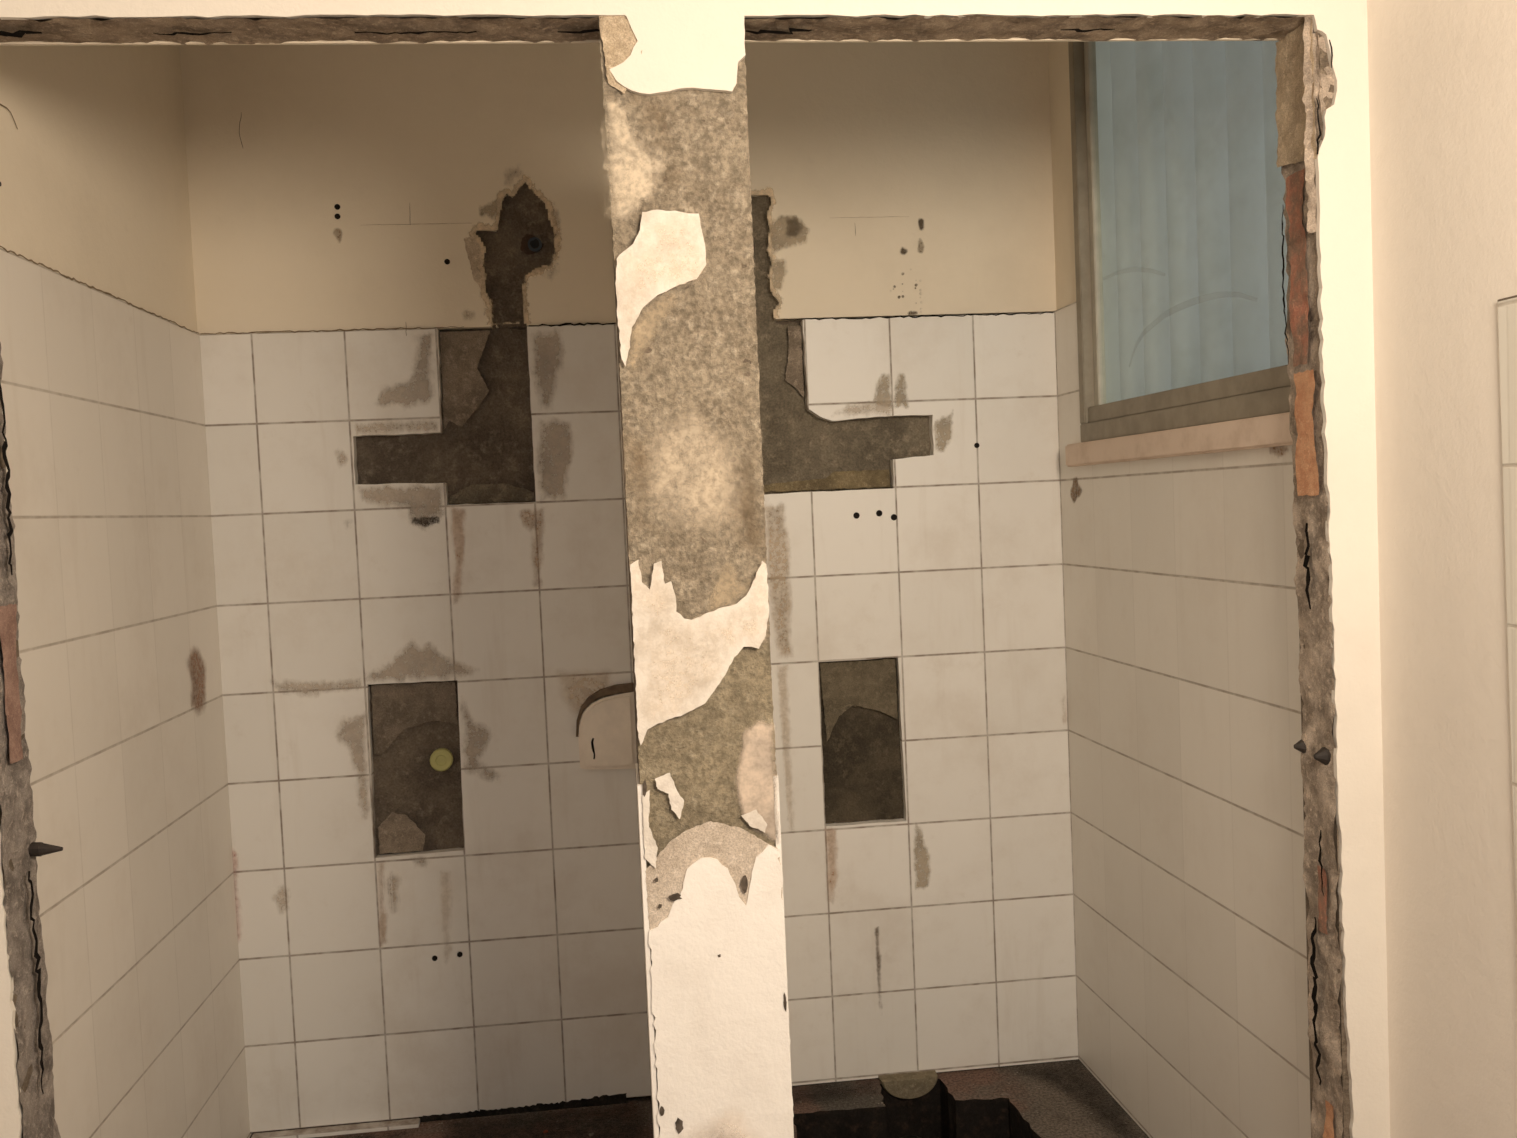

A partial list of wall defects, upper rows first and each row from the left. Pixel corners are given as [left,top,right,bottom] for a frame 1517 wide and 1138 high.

flaking render [1285,16,1334,496]
spalling [598,16,781,930]
flaking render [0,604,23,764]
peeling [370,680,464,855]
peeling [819,658,904,824]